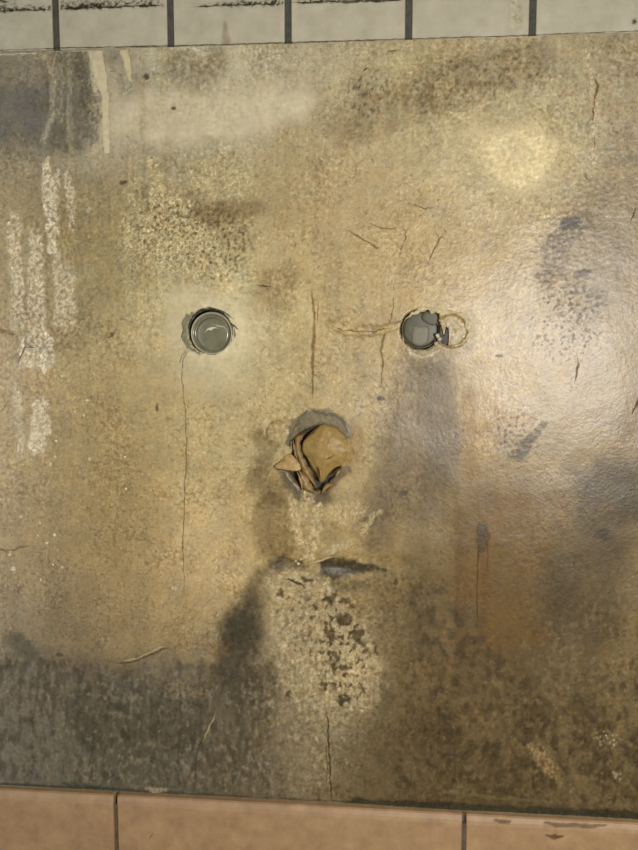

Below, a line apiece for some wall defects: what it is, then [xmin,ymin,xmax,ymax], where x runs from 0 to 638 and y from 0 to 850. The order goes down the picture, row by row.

damp [536,213,602,322]
spalling [402,307,478,361]
spalling [286,408,360,463]
damp [366,352,456,543]
damp [221,566,275,679]
crack [119,643,200,661]
crack [325,716,333,796]
damp [0,783,249,798]
damp [308,797,638,819]